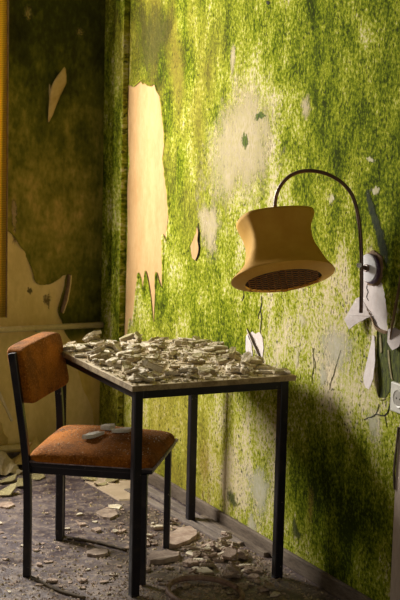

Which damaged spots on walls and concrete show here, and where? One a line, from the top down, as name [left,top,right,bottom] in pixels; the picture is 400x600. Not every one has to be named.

damp [131,3,174,80]
peeling [48,67,67,122]
damp [198,82,274,253]
peeling [124,79,170,335]
peeling [190,223,200,261]
peeling [0,228,80,445]
peeling [246,328,264,363]
spalling [344,276,400,401]
peeling [66,365,131,439]